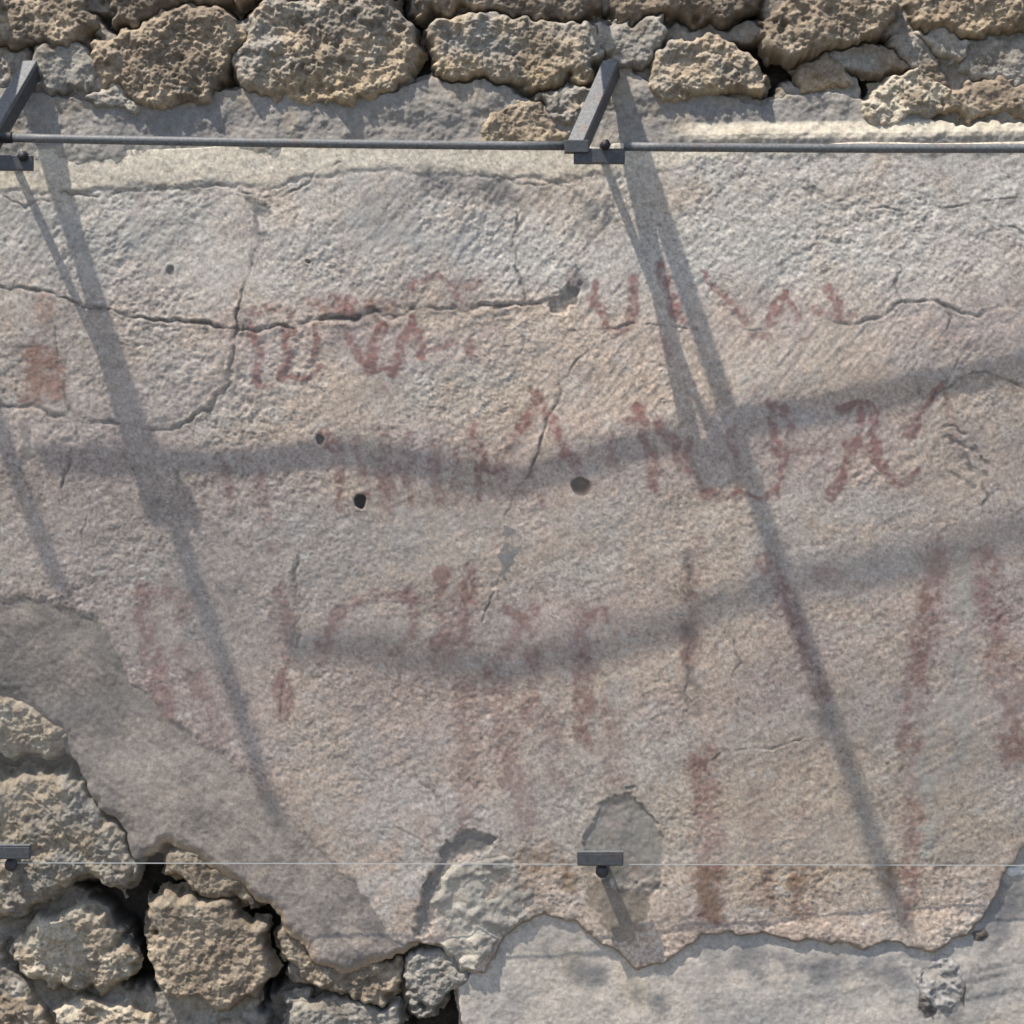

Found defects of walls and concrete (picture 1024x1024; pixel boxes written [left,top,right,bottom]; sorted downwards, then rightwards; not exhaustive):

crack [314,308,420,322]
crack [450,303,539,312]
crack [834,301,988,325]
crack [7,286,255,431]
spalling [414,830,496,936]
peeling [972,929,988,941]
peeling [916,955,966,1018]